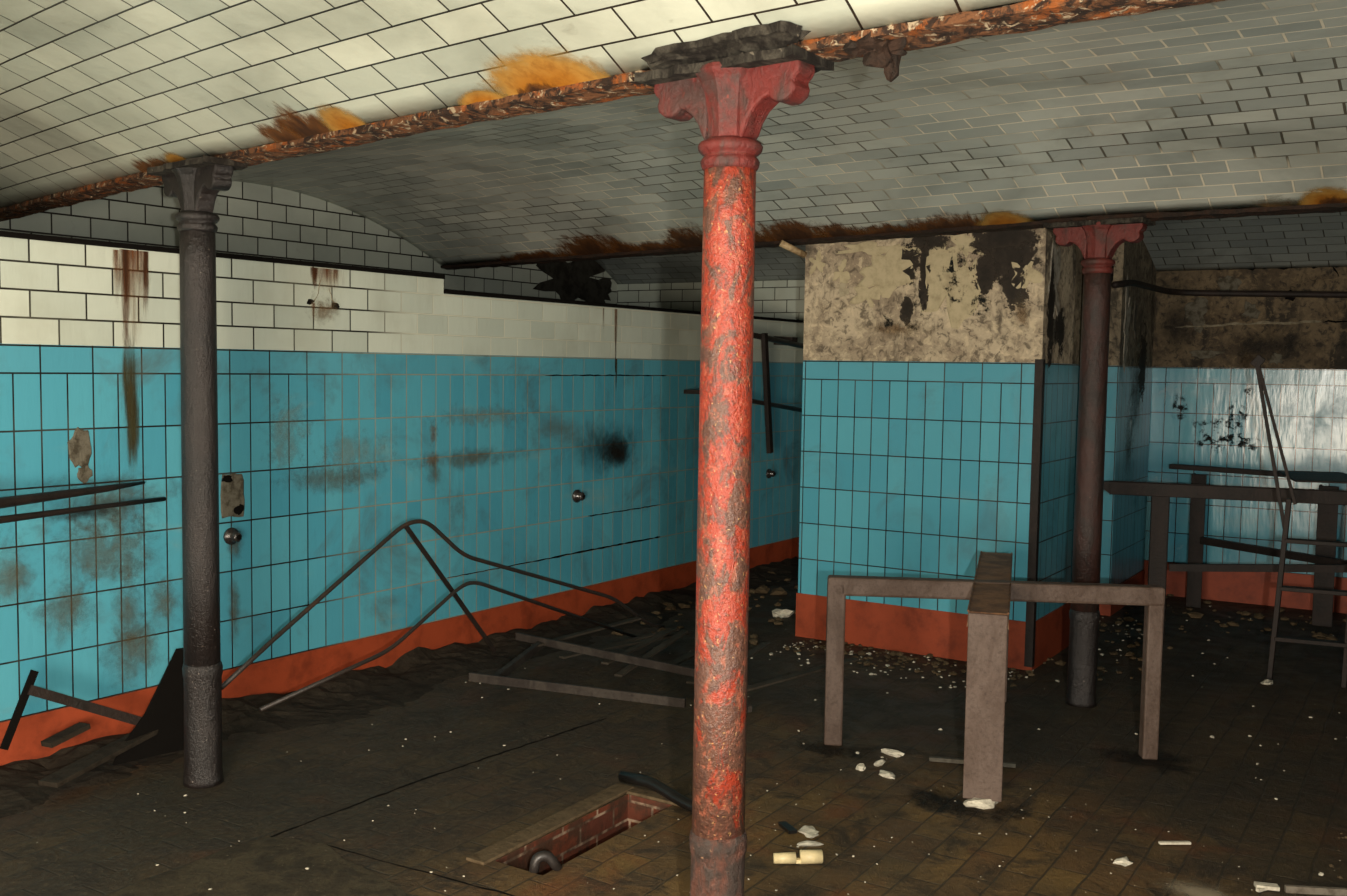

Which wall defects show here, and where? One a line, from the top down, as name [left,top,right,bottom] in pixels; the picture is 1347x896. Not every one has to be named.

spalling [641,20,811,70]
peeling [842,39,867,56]
rust [461,52,609,105]
rust [260,107,365,143]
rust [114,249,148,337]
rust [311,267,338,283]
peeling [809,234,984,329]
rust [123,355,139,458]
mould [1173,397,1256,450]